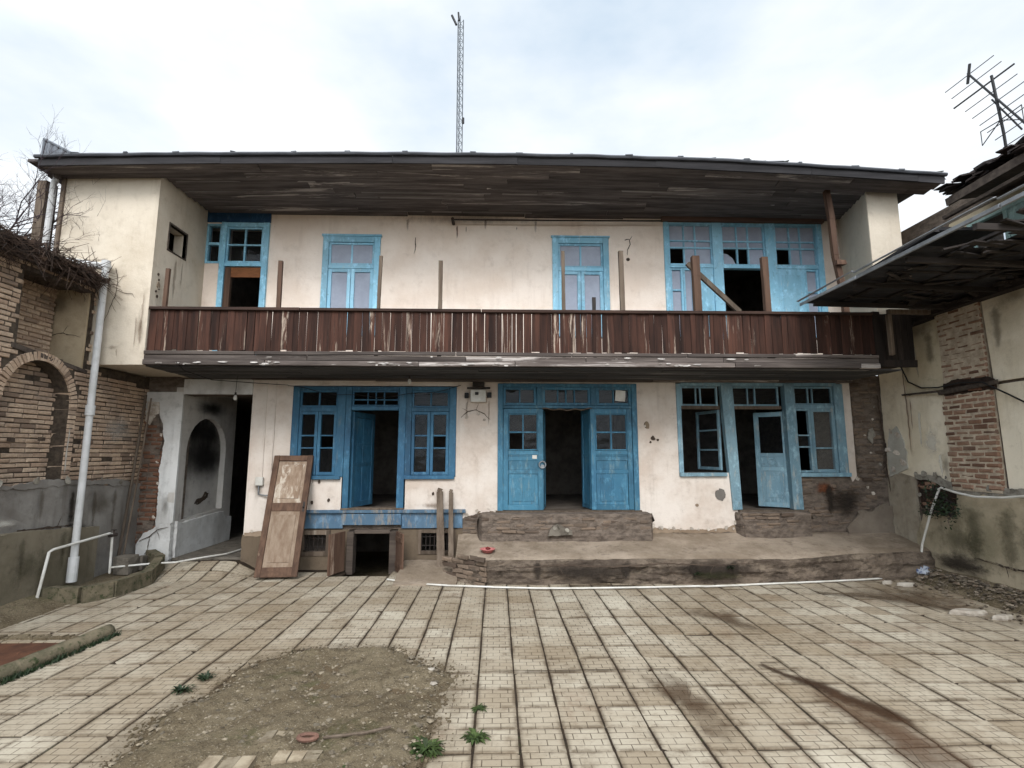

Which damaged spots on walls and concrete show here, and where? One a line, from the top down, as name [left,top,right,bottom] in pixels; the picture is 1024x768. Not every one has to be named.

leakage [192,421,215,444]
spalling [0,401,164,552]
leakage [827,486,858,513]
spalling [914,471,1024,514]
leakage [938,554,985,574]